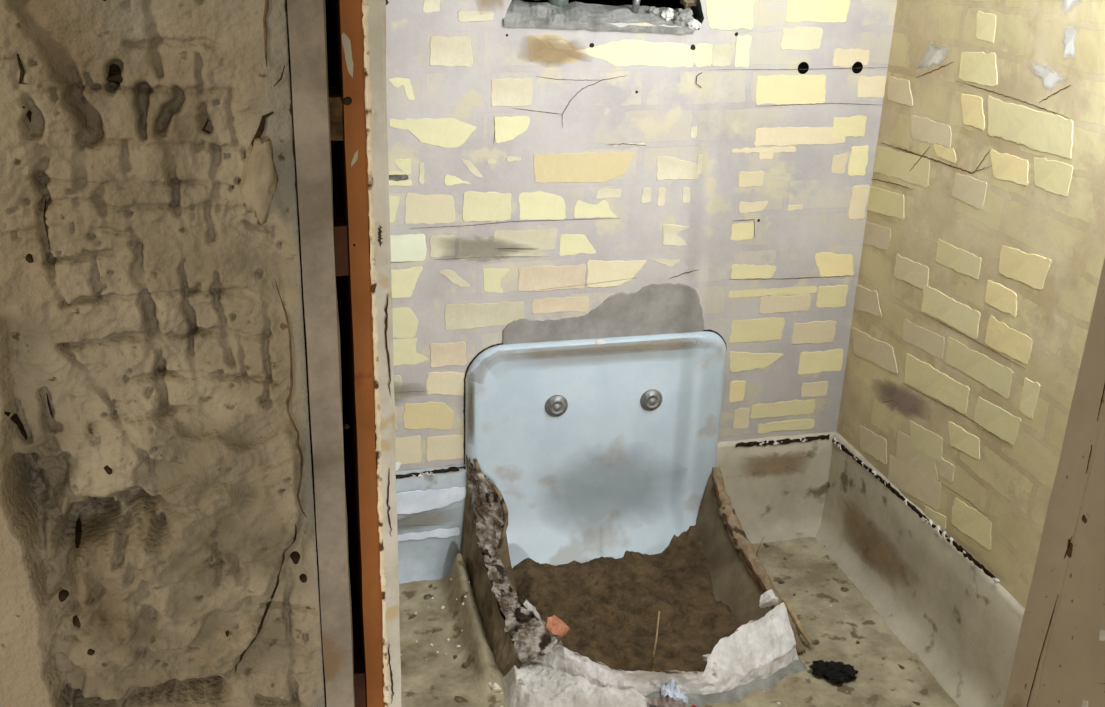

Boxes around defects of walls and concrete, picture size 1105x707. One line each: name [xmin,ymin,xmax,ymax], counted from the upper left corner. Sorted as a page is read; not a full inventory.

leakage [531,42,577,63]
flaking render [1063,29,1077,57]
crack [235,280,307,673]
flaking render [362,0,680,707]
flaking render [528,0,1073,554]